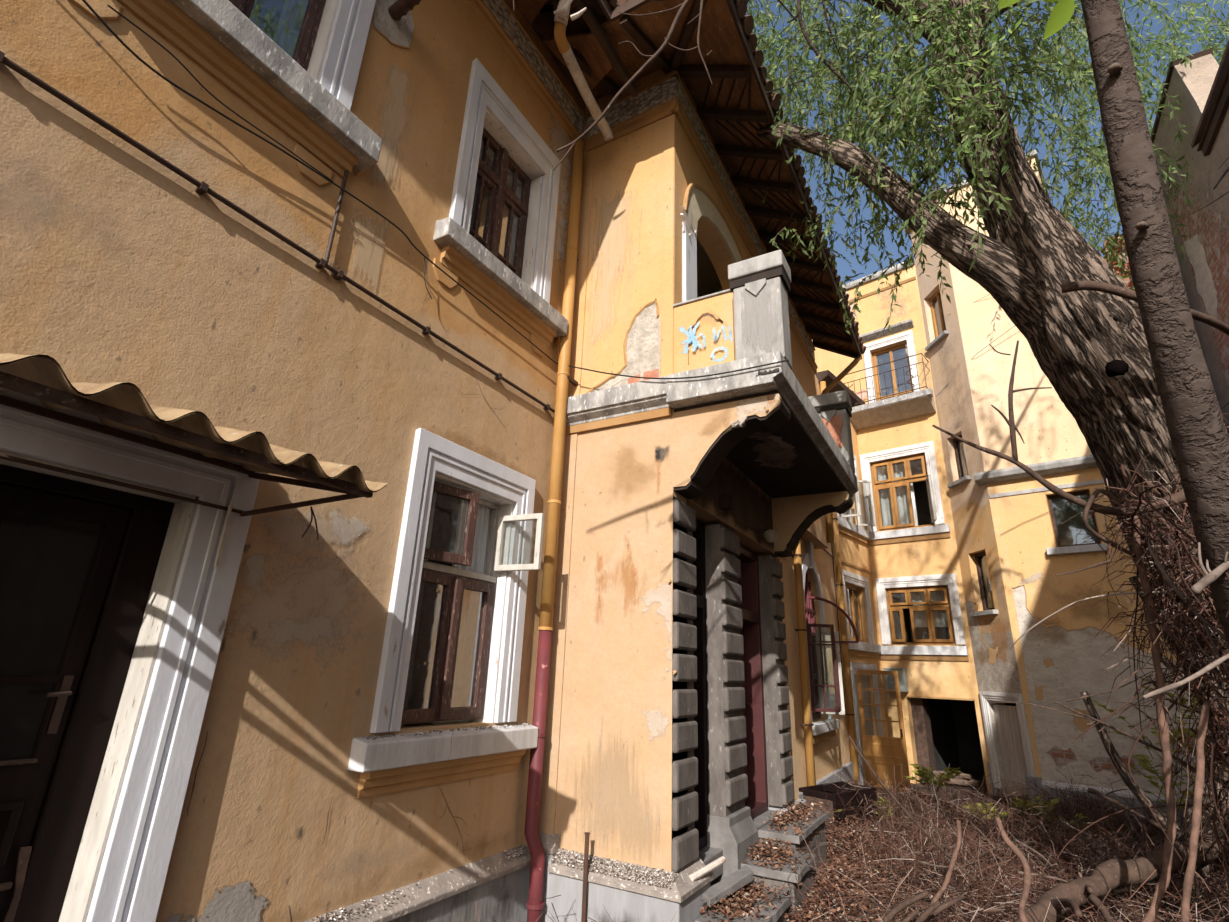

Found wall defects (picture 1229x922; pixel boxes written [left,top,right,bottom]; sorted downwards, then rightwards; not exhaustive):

flaking render [586,298,661,393]
flaking render [965,572,1212,797]
flaking render [165,881,269,922]